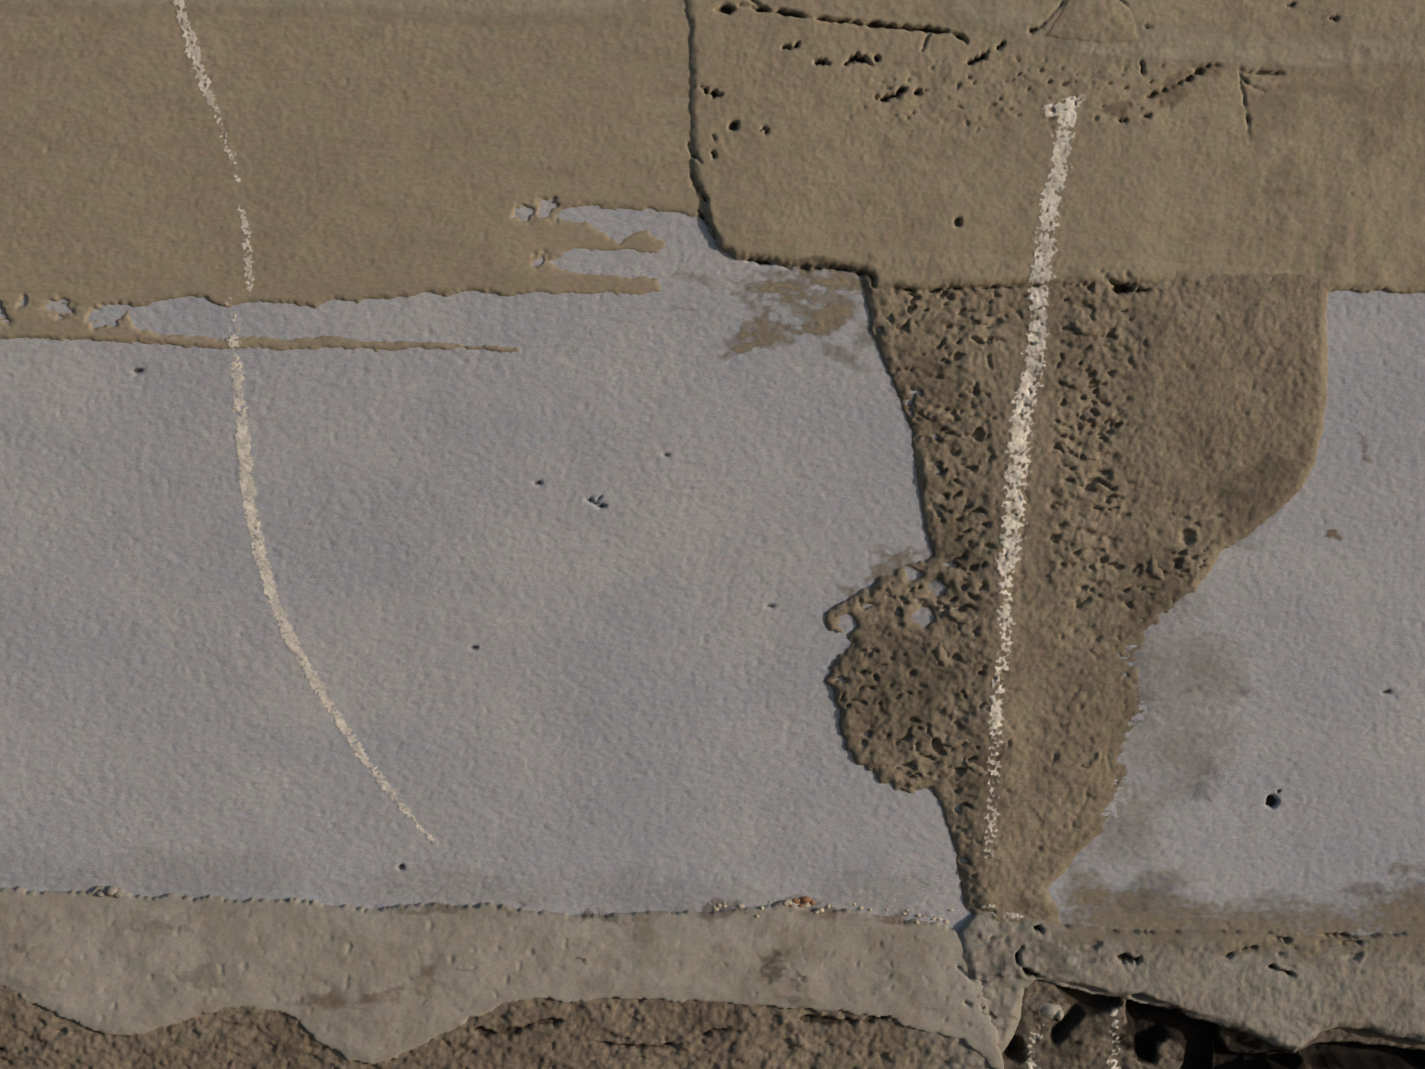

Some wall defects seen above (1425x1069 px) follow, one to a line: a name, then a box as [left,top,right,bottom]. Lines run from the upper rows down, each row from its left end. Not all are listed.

crack [755,8,1037,65]
crack [1119,27,1209,123]
crack [1241,71,1278,84]
crack [880,89,920,102]
spalling [1111,282,1139,293]
peeling [1064,443,1108,461]
peeling [947,607,978,625]
spalling [1265,790,1281,807]
crack [475,1018,562,1036]
crack [800,1014,887,1025]
crack [600,1028,724,1048]
leakage [1043,1014,1134,1062]